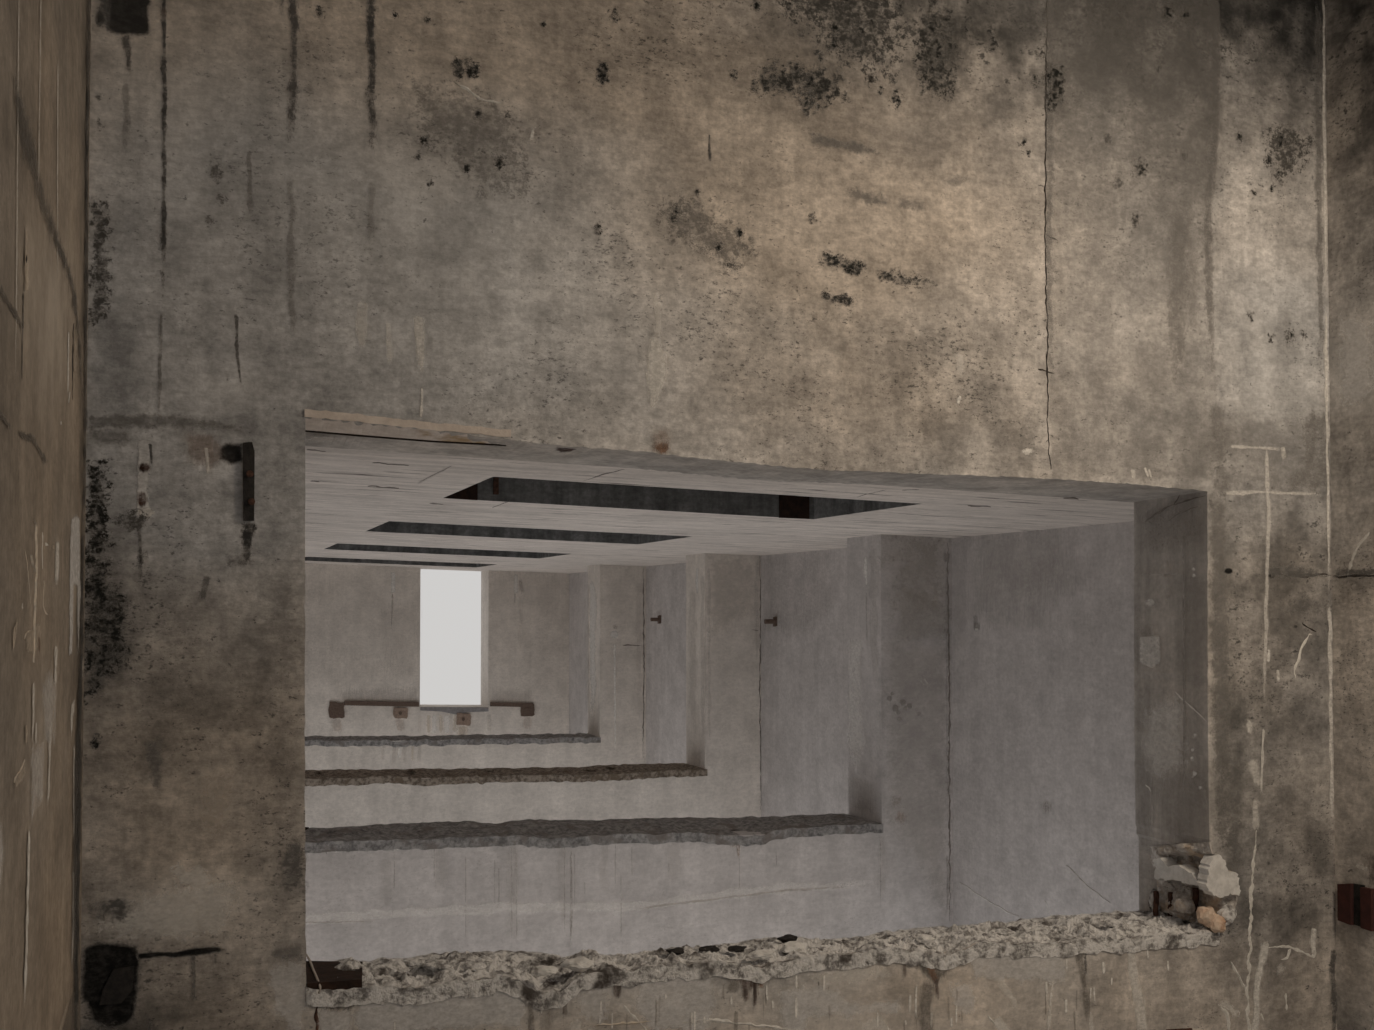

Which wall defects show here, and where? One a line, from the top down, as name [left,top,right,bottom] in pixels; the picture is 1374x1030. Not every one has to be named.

leakage [281,0,299,130]
leakage [366,0,377,147]
leakage [451,57,511,118]
leakage [730,0,971,118]
leakage [813,134,875,153]
leakage [657,188,758,275]
leakage [821,291,854,306]
leakage [819,251,938,289]
leakage [15,0,234,1030]
crack [1224,564,1374,628]
spalling [1148,842,1241,933]